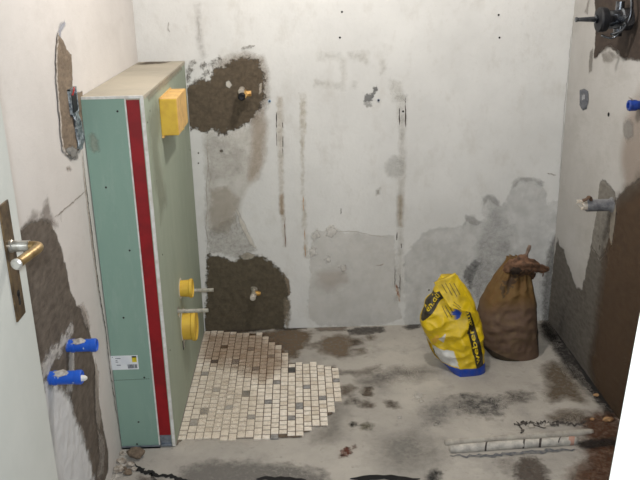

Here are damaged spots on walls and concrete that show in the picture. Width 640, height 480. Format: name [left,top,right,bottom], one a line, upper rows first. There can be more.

crack [55,155,121,439]